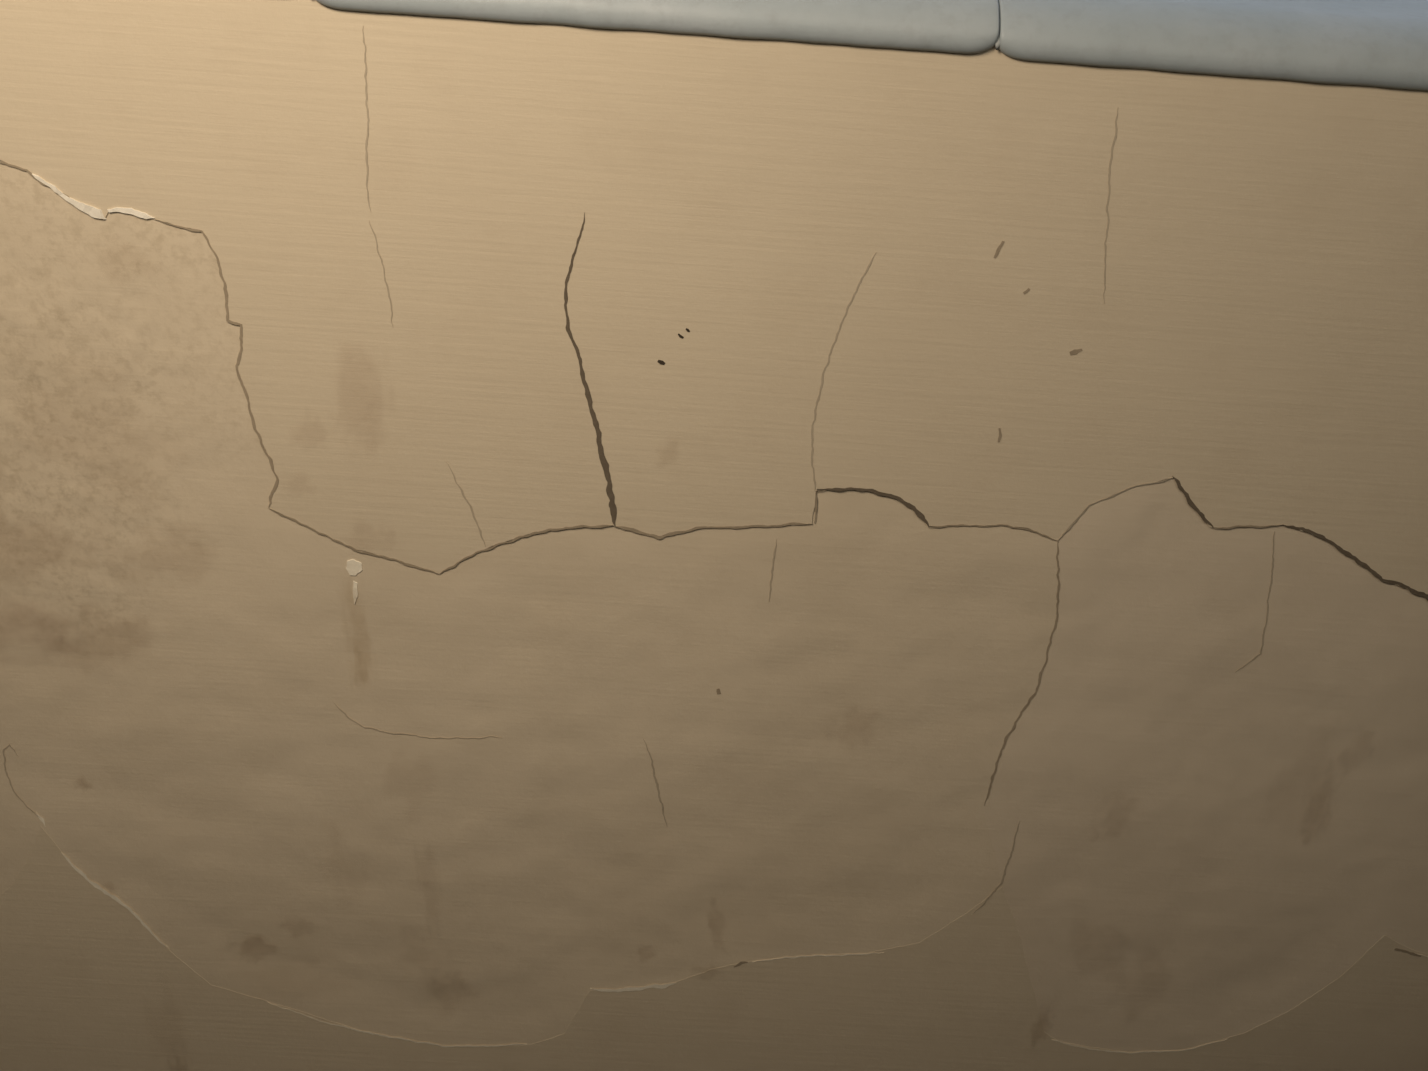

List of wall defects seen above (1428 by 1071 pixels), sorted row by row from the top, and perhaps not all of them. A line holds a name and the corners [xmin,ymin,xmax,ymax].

crack [0,160,70,198]
crack [362,29,393,326]
crack [1103,109,1118,297]
crack [155,212,1428,806]
crack [642,737,667,825]
crack [972,821,1020,914]